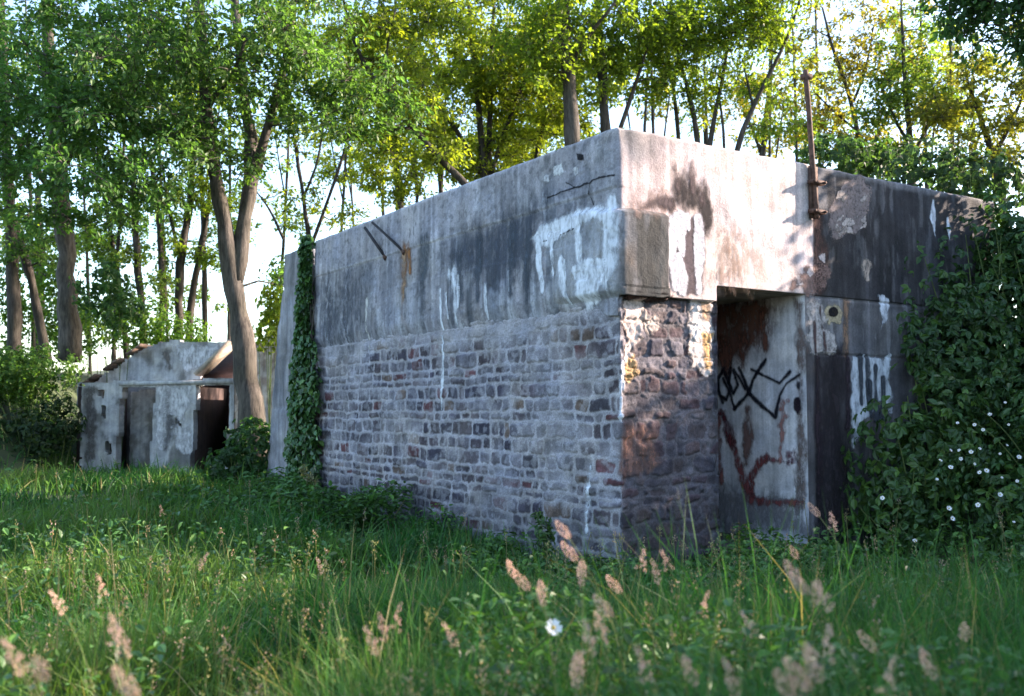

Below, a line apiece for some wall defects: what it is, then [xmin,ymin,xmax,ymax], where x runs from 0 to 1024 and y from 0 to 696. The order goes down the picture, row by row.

crack [547,174,615,205]
leakage [633,163,713,236]
spalling [828,175,871,239]
leakage [930,200,951,239]
rust [402,243,411,300]
leakage [419,234,429,288]
leakage [439,195,620,408]
peeling [622,210,715,383]
leakage [863,260,871,281]